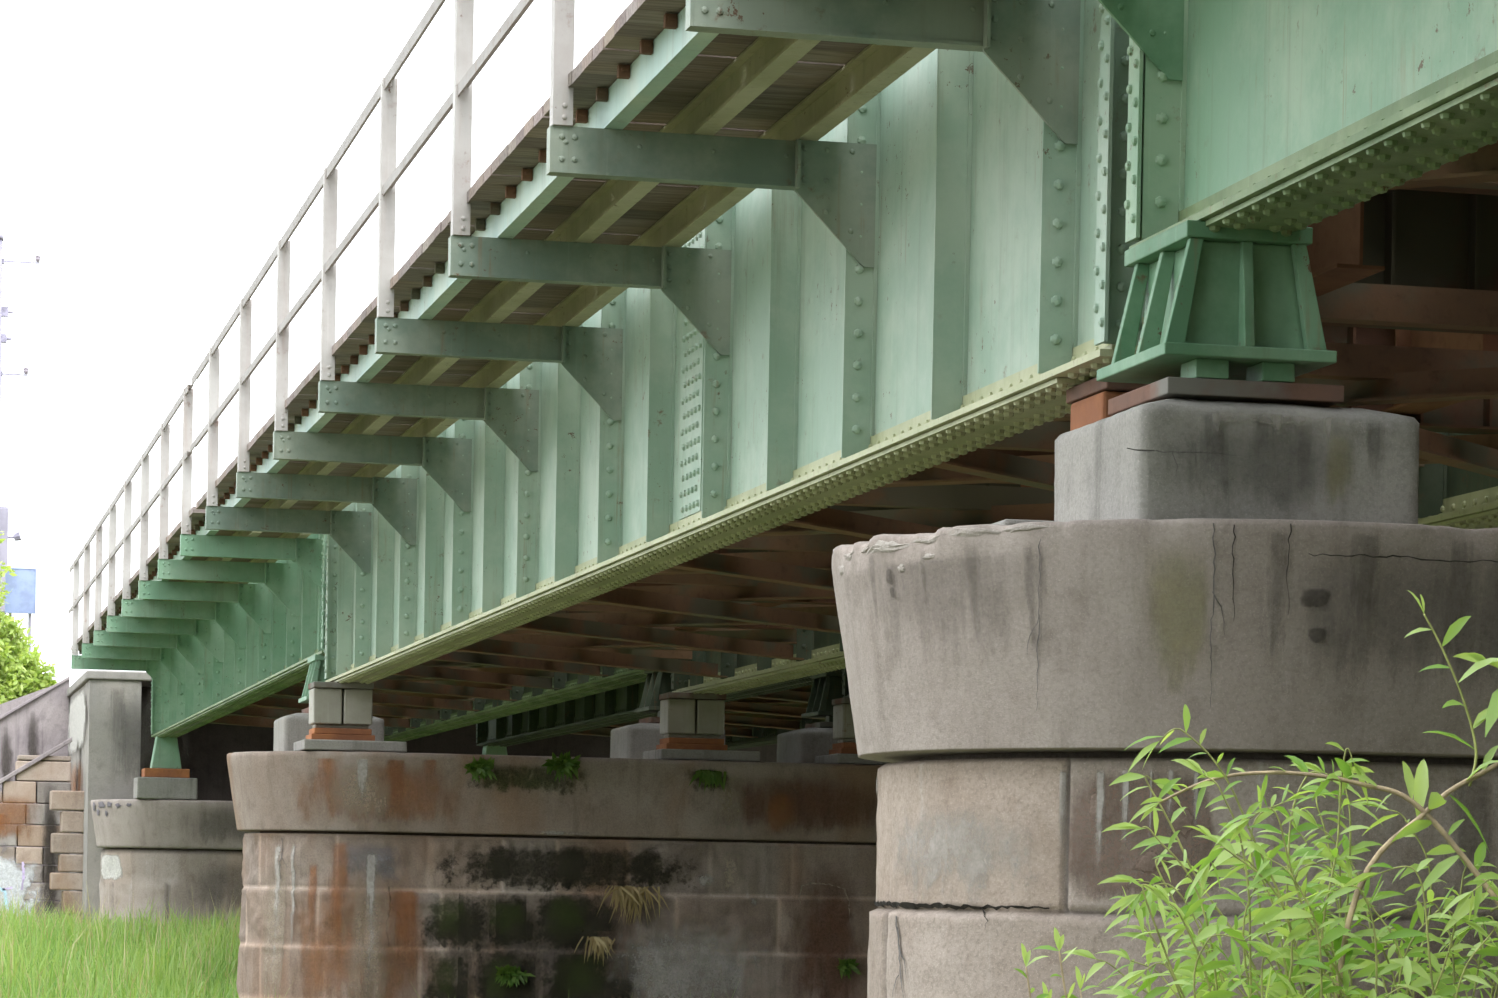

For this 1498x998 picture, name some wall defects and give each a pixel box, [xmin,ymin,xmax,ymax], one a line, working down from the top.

spalling [838,523,1051,592]
crack [1286,524,1498,613]
crack [1027,539,1041,711]
crack [1210,523,1236,706]
damp [488,846,509,883]
damp [633,850,662,886]